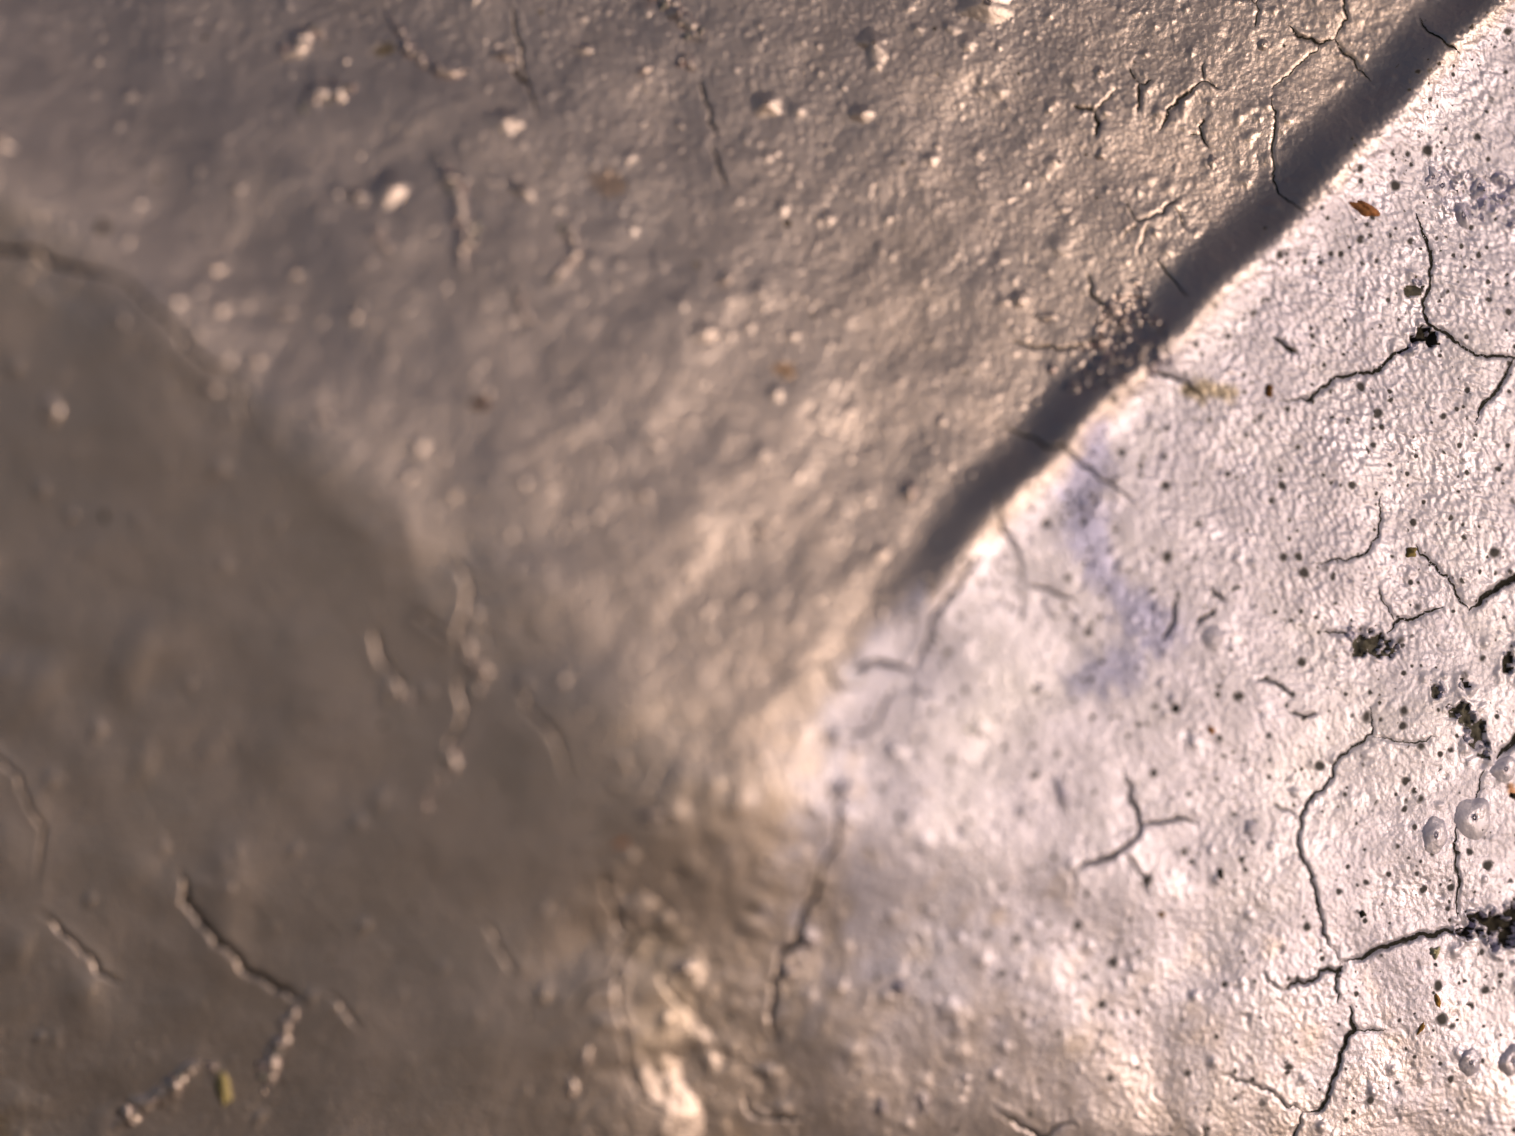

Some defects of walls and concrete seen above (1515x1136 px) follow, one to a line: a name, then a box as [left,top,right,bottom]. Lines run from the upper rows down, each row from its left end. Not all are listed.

crack [1420,18,1461,55]
crack [1252,0,1372,218]
crack [1273,337,1299,355]
crack [1279,213,1515,422]
crack [1311,497,1382,564]
crack [821,489,1076,754]
spalling [1345,627,1400,658]
crack [1379,544,1515,634]
crack [1257,678,1317,717]
crack [1072,769,1198,897]
crack [1218,706,1515,1136]
spalling [1454,901,1515,951]